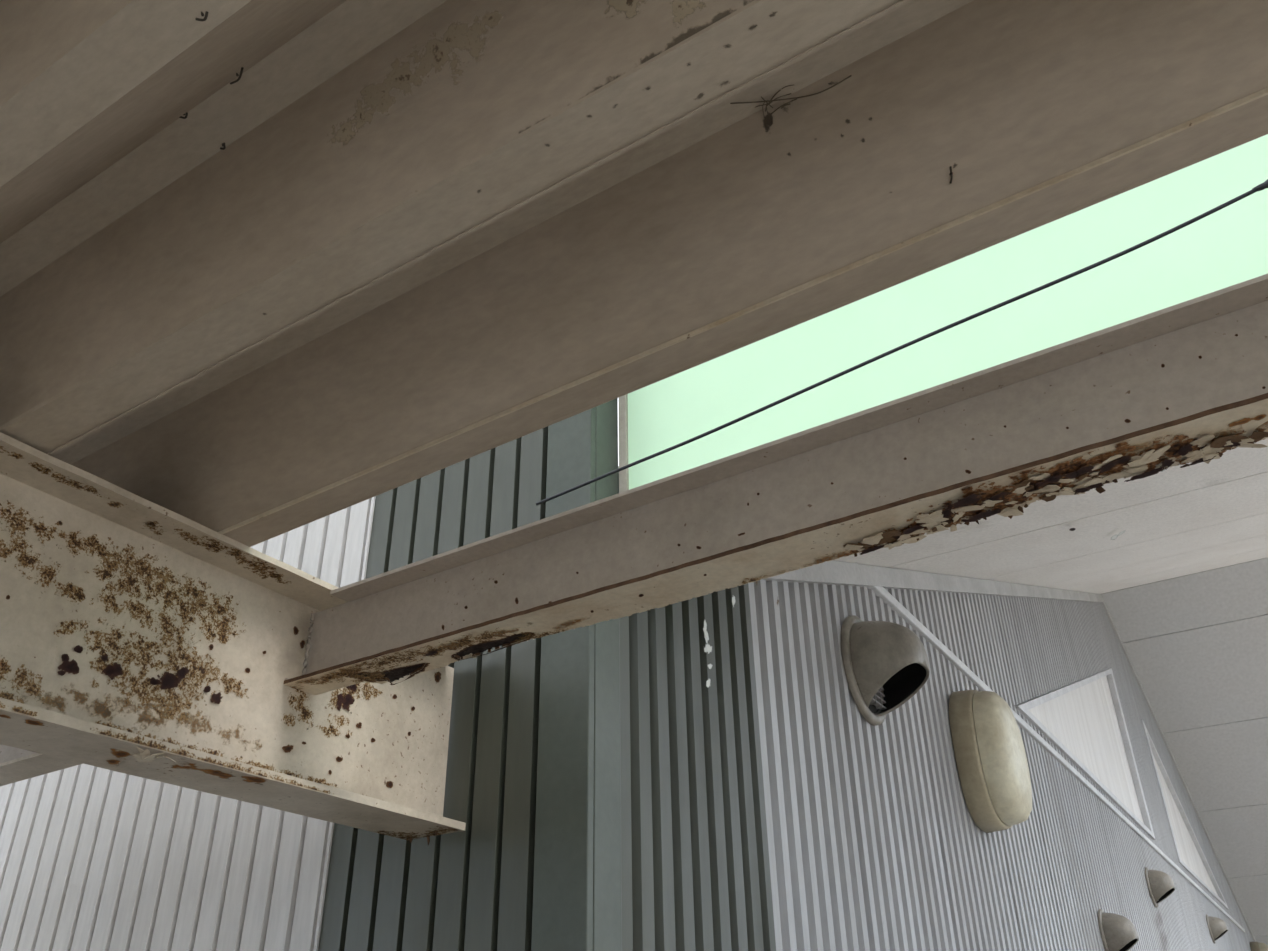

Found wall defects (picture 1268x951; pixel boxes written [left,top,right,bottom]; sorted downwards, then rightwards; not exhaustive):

corrosion [0,446,124,508]
corrosion [808,414,1268,565]
corrosion [0,500,343,794]
corrosion [281,610,594,753]